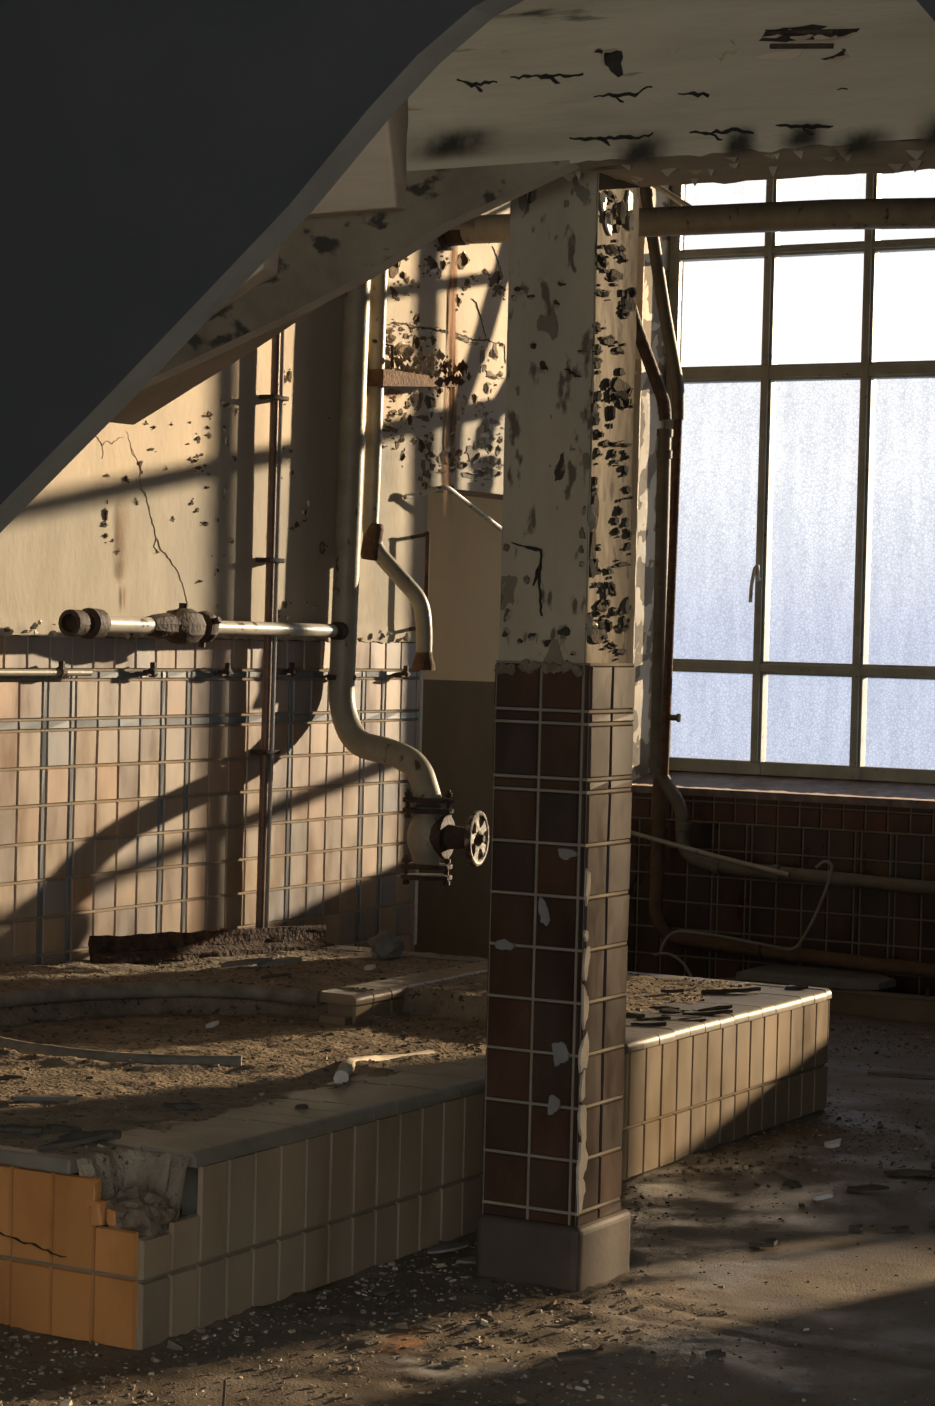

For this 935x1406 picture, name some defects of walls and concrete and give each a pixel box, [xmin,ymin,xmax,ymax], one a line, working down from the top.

peeling [594,165,646,319]
peeling [661,157,740,186]
peeling [888,150,926,173]
peeling [382,245,535,490]
crack [96,431,188,603]
spalling [494,321,635,677]
crack [0,1232,67,1257]